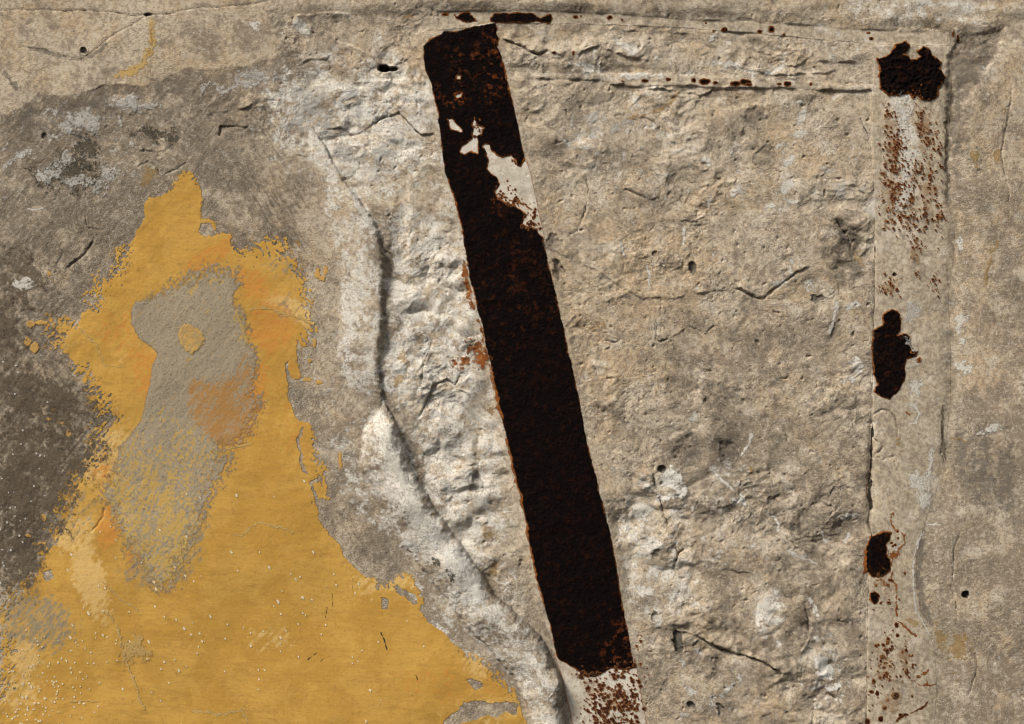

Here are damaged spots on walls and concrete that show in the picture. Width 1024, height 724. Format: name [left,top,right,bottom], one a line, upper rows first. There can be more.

corrosion [691,78,753,86]
corrosion [876,40,948,297]
peeling [0,171,527,724]
corrosion [423,11,649,724]
crack [867,362,893,536]
corrosion [871,309,922,399]
corrosion [859,512,936,724]